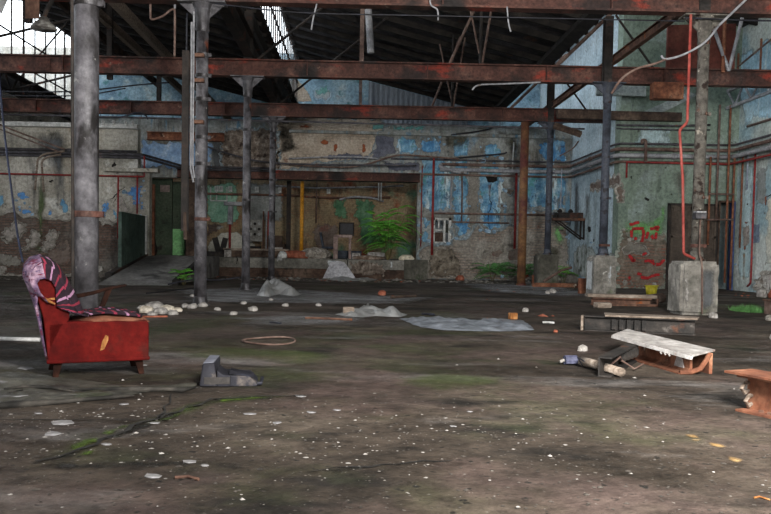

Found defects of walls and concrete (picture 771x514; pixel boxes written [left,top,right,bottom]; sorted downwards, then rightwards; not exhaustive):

flaking render [0,192,71,277]
water stain [33,172,45,235]
flaking render [99,180,146,277]
peeling [141,139,195,169]
flaking render [207,118,598,281]
peeling [734,166,771,294]